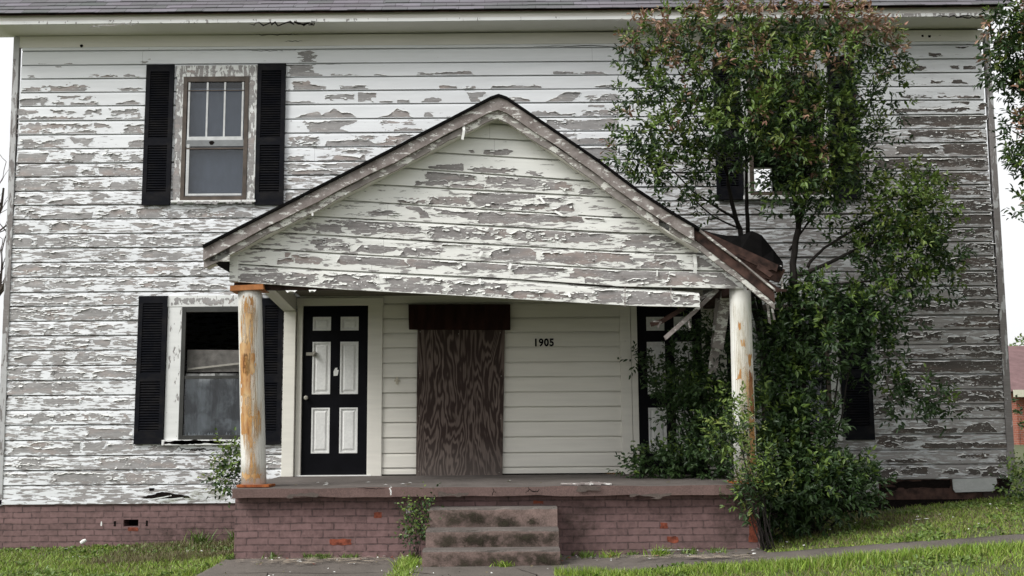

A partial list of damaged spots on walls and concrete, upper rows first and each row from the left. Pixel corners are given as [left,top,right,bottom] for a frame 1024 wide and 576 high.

crack [251,21,316,66]
peeling [284,50,622,200]
peeling [3,70,255,484]
peeling [236,126,739,306]
peeling [874,52,1012,493]
corrosion [240,295,261,481]
peeling [266,455,281,468]
corrosion [736,322,756,468]